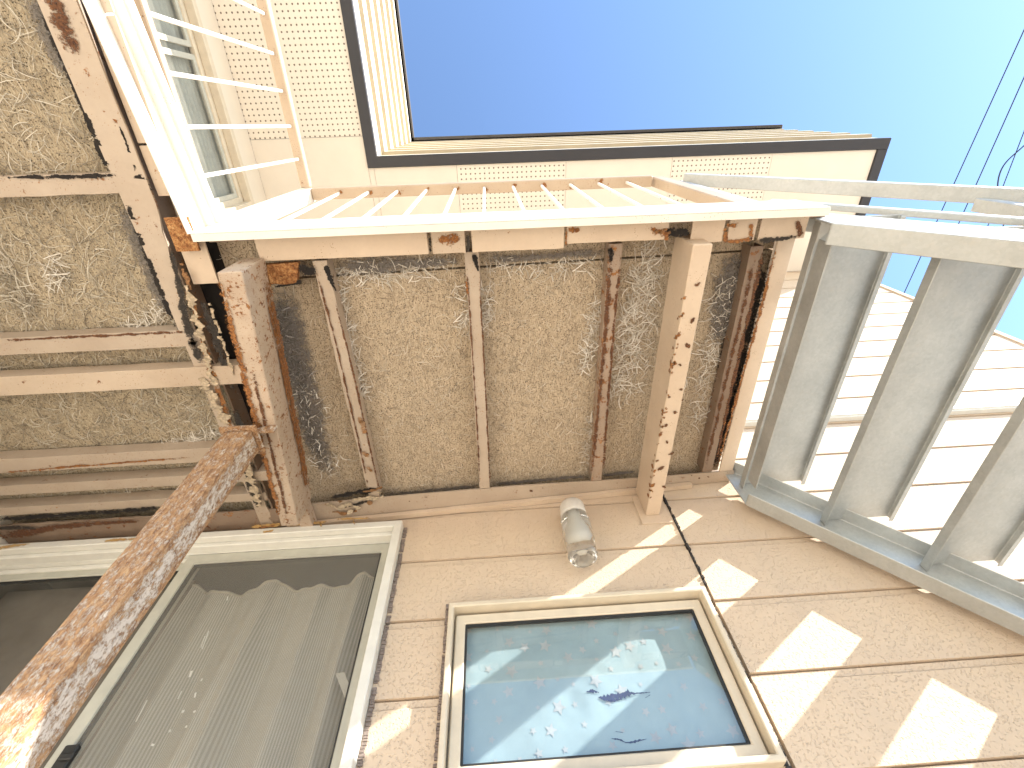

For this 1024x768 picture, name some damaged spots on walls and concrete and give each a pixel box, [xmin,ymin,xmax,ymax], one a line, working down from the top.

corrosion [3,0,116,180]
corrosion [0,506,160,549]
corrosion [7,205,300,533]
corrosion [264,271,311,493]
corrosion [316,265,379,486]
peeling [326,486,384,516]
corrosion [429,234,491,482]
corrosion [591,248,621,471]
corrosion [647,388,684,498]
corrosion [651,227,690,241]
corrosion [668,332,691,375]
corrosion [707,221,804,462]